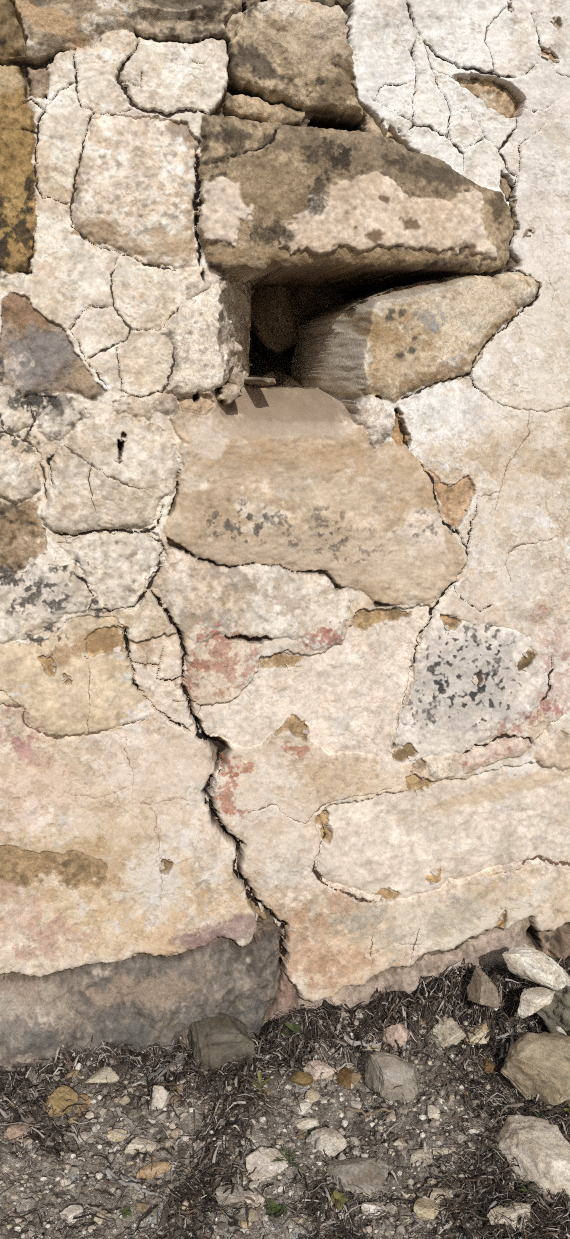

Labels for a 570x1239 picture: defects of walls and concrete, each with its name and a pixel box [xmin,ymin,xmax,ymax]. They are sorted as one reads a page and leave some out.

spalling [453,70,525,118]
crack [25,37,279,398]
crack [373,0,570,754]
spalling [428,470,476,536]
spalling [440,613,462,631]
crack [0,396,391,972]
spalling [472,672,484,688]
spalling [515,647,539,672]
spalling [0,845,108,891]
crack [494,855,570,875]